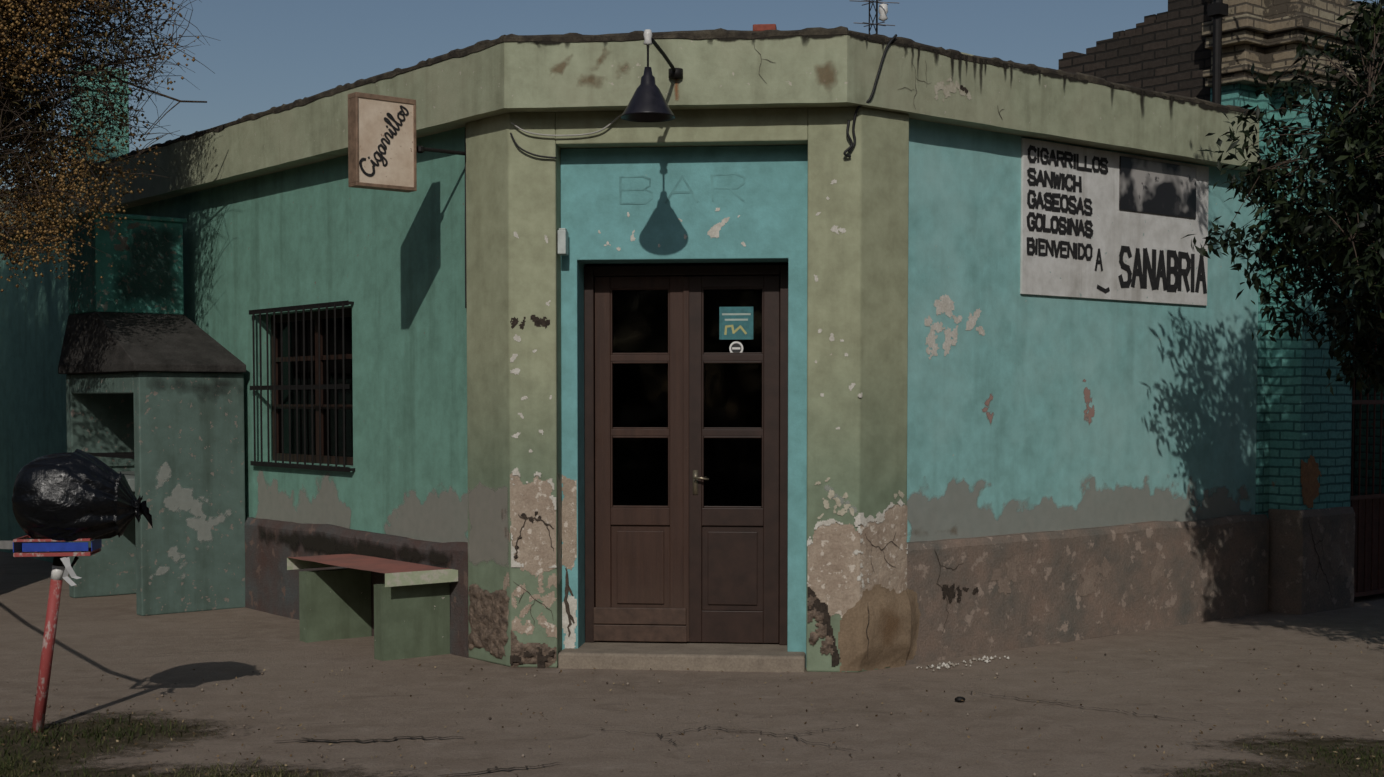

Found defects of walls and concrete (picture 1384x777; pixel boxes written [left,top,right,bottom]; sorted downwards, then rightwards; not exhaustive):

water stain [709,33,1088,88]
spalling [707,208,740,238]
peeling [924,294,985,359]
peeling [1301,455,1322,508]
peeling [385,467,577,668]
crack [513,514,575,637]
peeling [807,477,1251,666]